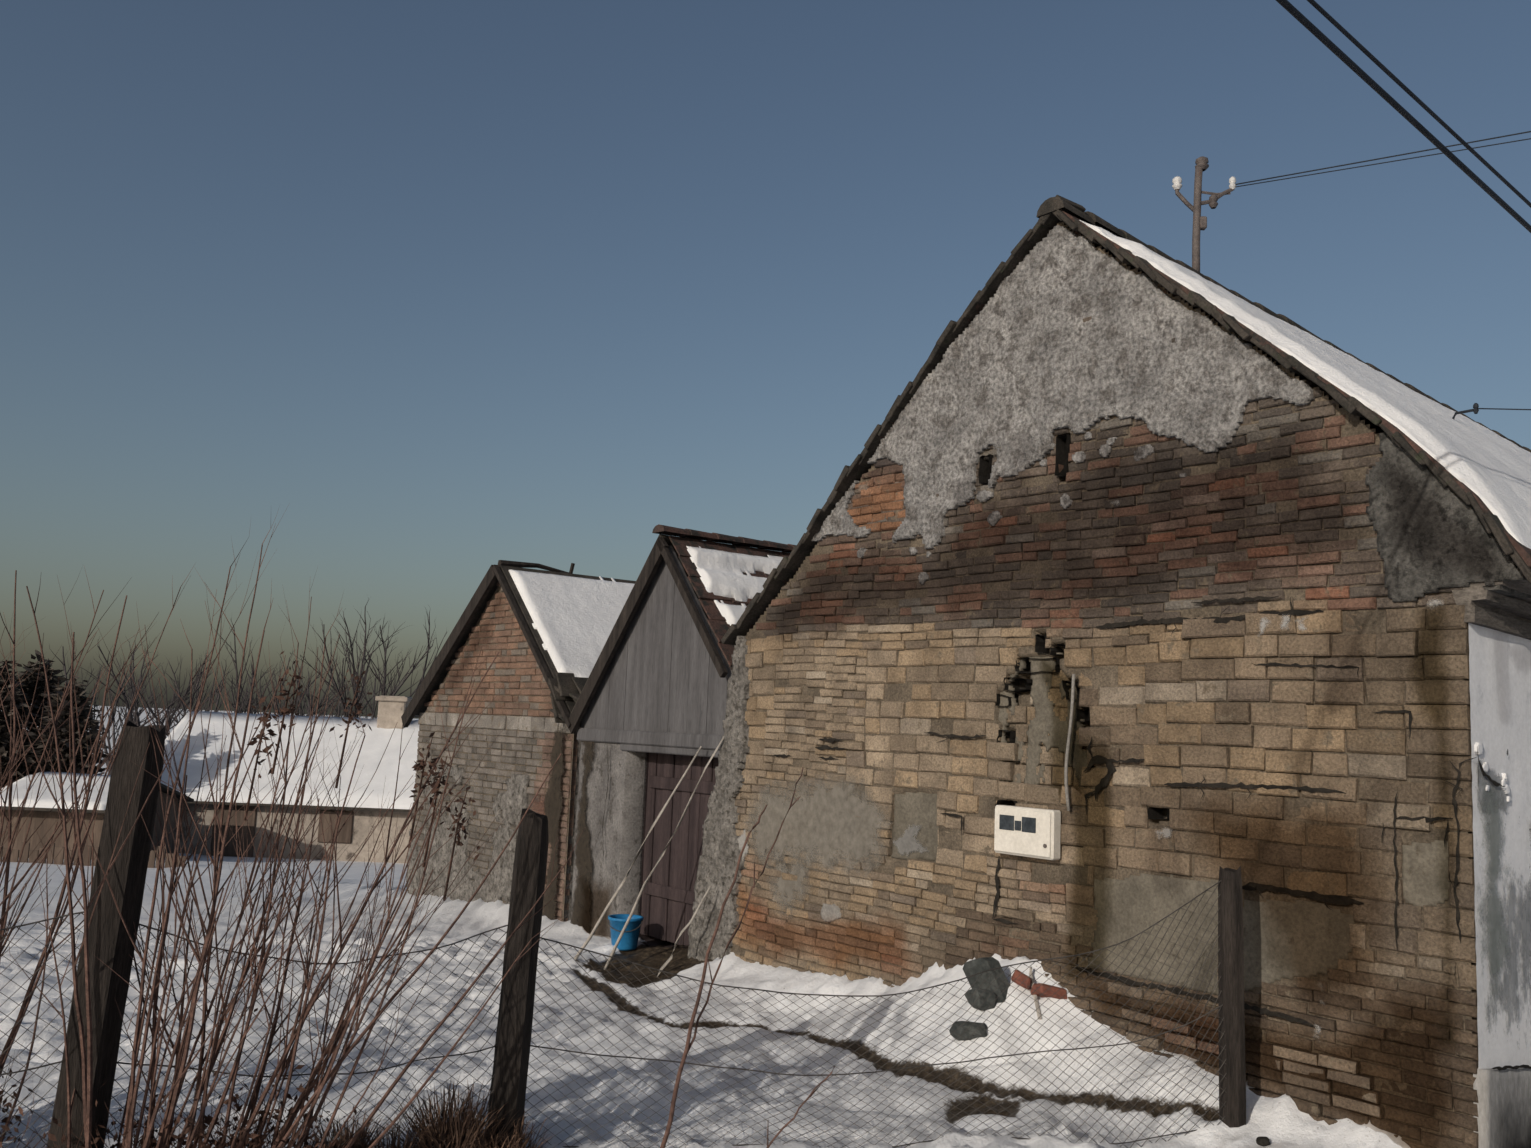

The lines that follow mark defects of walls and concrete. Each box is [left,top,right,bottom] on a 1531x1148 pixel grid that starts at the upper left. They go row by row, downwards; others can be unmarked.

flaking render [812,225,1315,585]
spalling [997,730,1016,743]
spalling [995,634,1090,722]
damp [1487,867,1531,1030]